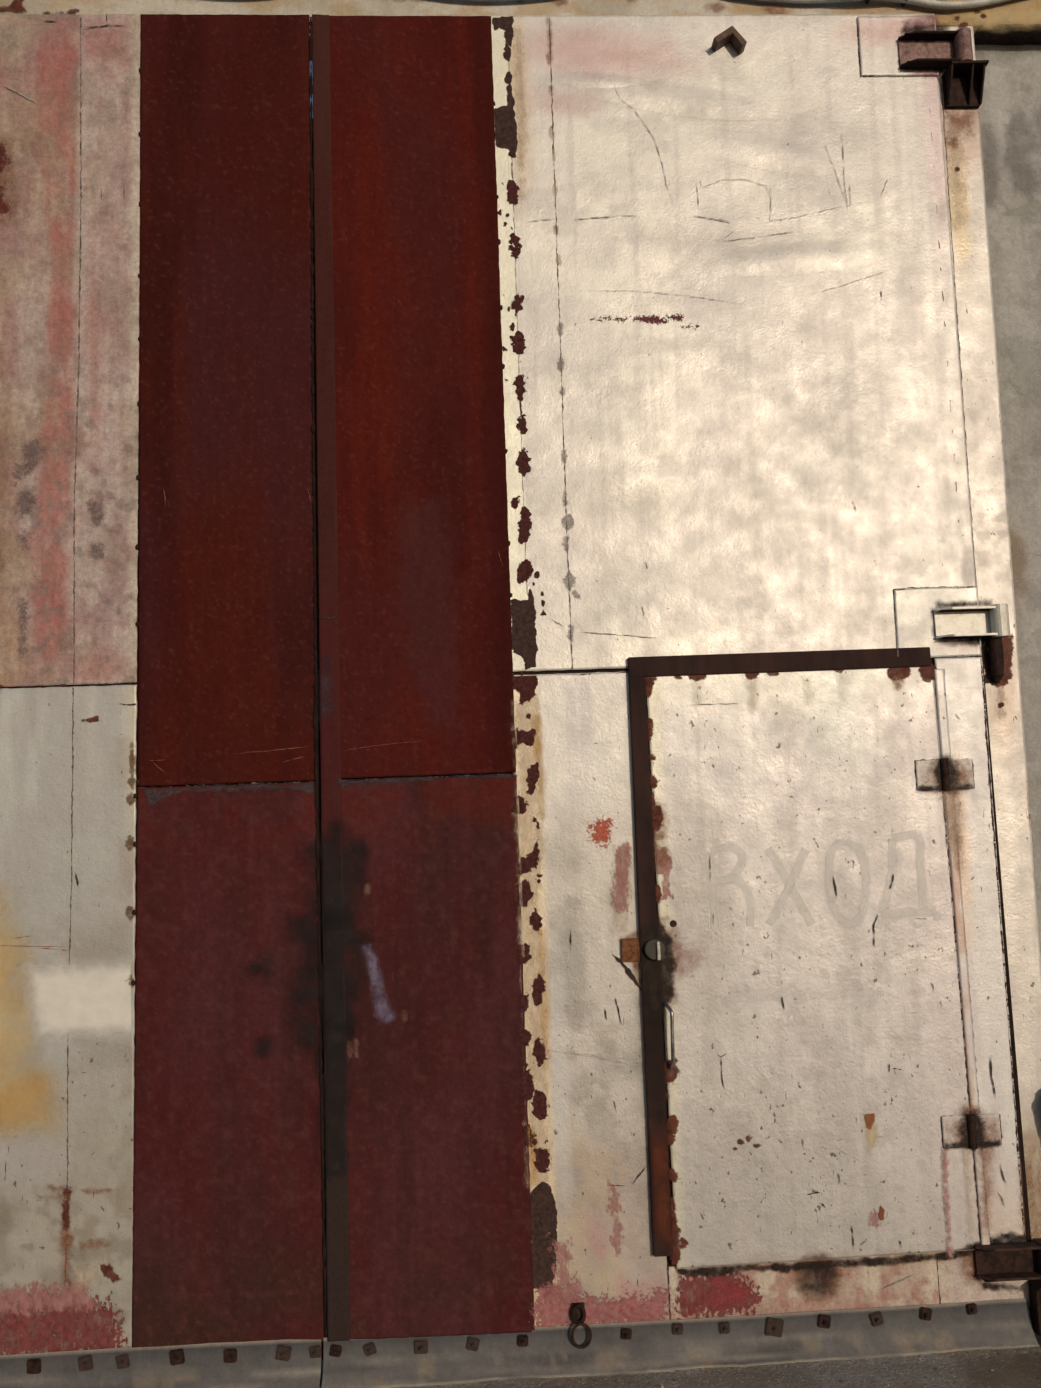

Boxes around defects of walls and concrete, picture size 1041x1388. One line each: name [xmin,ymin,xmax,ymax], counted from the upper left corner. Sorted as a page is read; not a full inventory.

peeling [492,16,522,259]
peeling [590,313,701,330]
peeling [502,294,547,749]
rust [645,676,657,697]
rust [887,664,937,688]
peeling [338,762,546,1012]
peeling [587,816,632,919]
rust [647,718,666,866]
rust [919,756,973,851]
rust [657,921,677,1005]
peeling [519,1029,763,1332]
rust [651,1058,1041,1291]